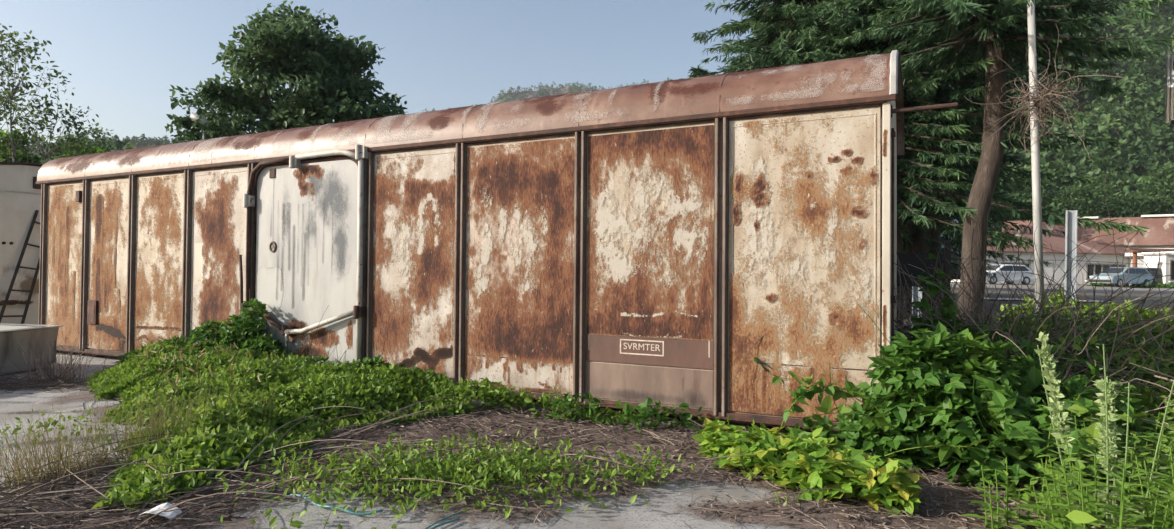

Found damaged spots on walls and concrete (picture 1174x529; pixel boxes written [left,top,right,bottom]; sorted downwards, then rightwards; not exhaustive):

corrosion [625,61,825,102]
corrosion [222,117,379,149]
corrosion [419,104,482,130]
corrosion [525,91,585,115]
corrosion [293,165,325,201]
corrosion [0,144,245,351]
corrosion [372,125,713,395]
corrosion [729,117,888,421]
corrosion [288,319,353,359]